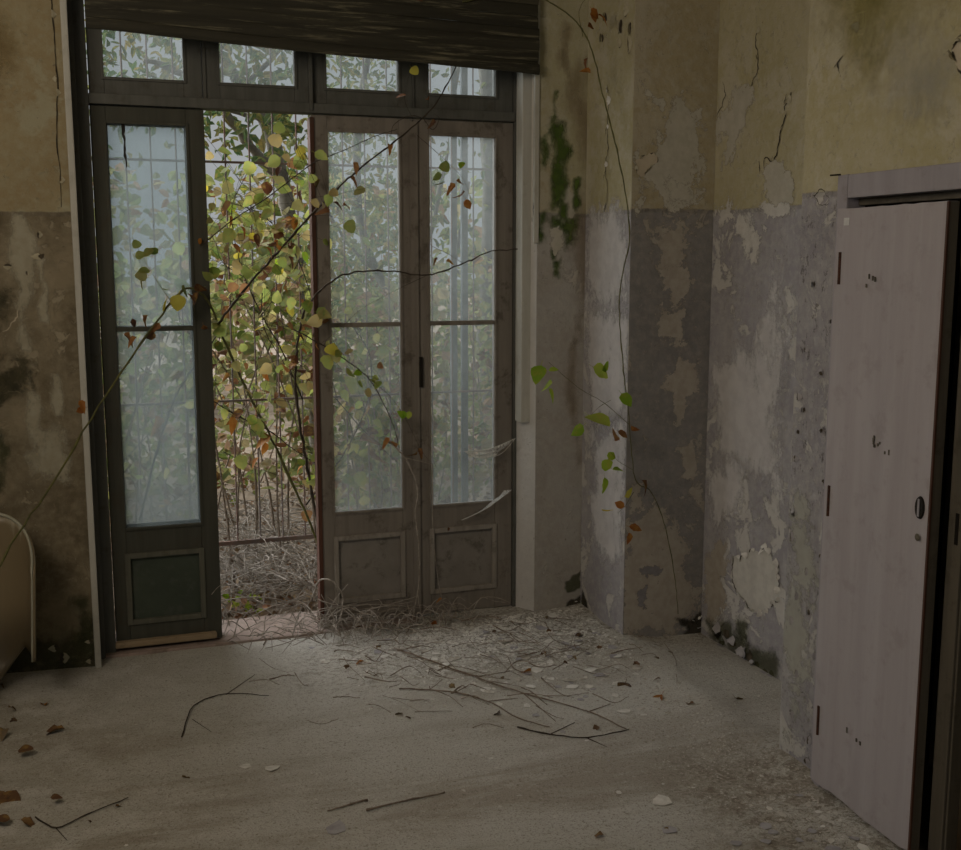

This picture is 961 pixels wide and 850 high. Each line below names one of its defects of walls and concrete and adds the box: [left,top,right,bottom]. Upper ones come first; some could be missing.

crack [759,92,791,171]
peeling [549,180,576,256]
damp [559,177,581,219]
peeling [758,200,790,219]
damp [0,214,70,482]
peeling [585,196,773,677]
peeling [674,271,794,528]